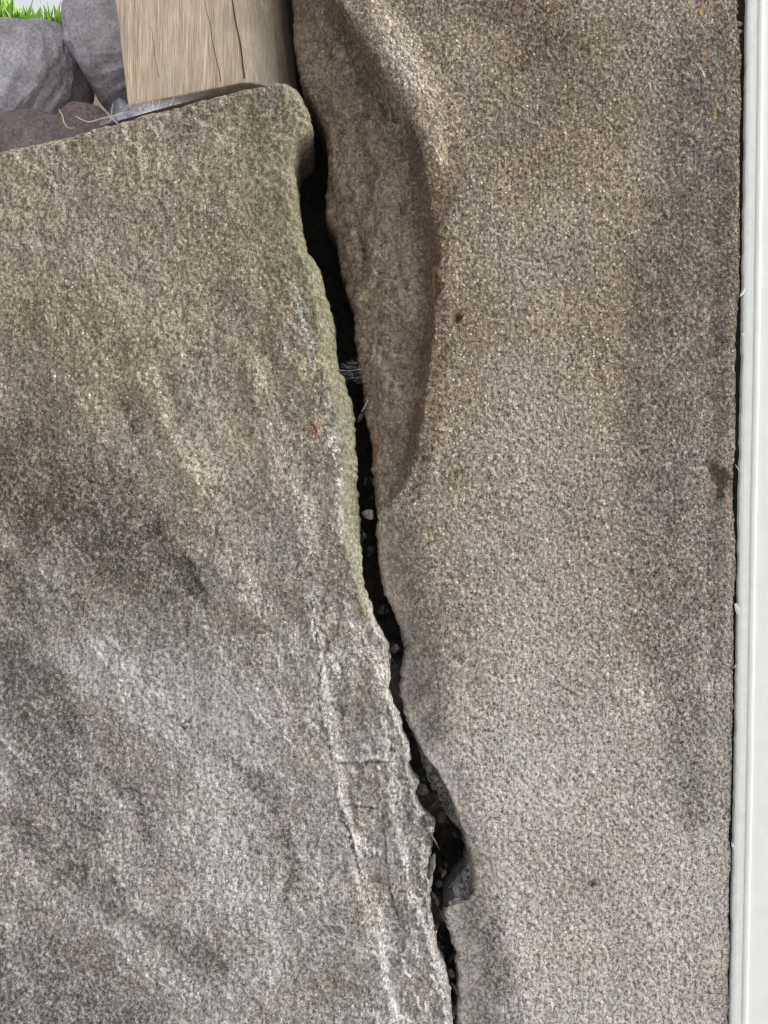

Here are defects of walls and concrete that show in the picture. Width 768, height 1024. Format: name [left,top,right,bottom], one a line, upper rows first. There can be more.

crack [296,77,305,105]
crack [300,133,465,1019]